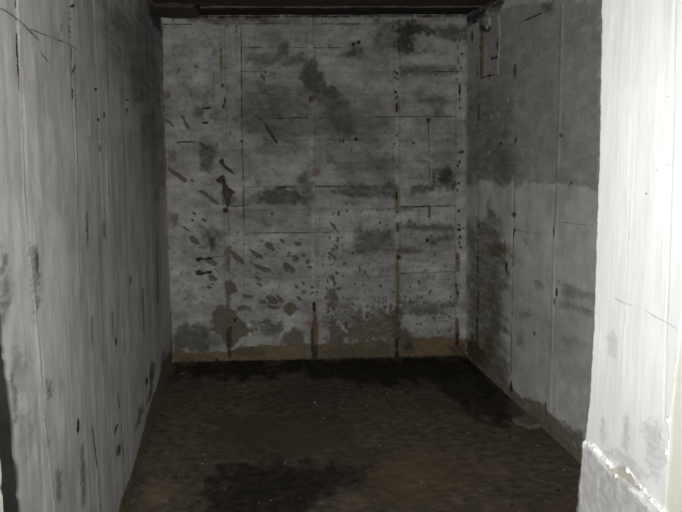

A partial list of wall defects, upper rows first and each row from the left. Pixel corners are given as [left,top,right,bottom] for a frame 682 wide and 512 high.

damp [290,58,341,105]
corrosion [308,302,318,360]
damp [119,212,647,512]
spalling [582,440,666,512]